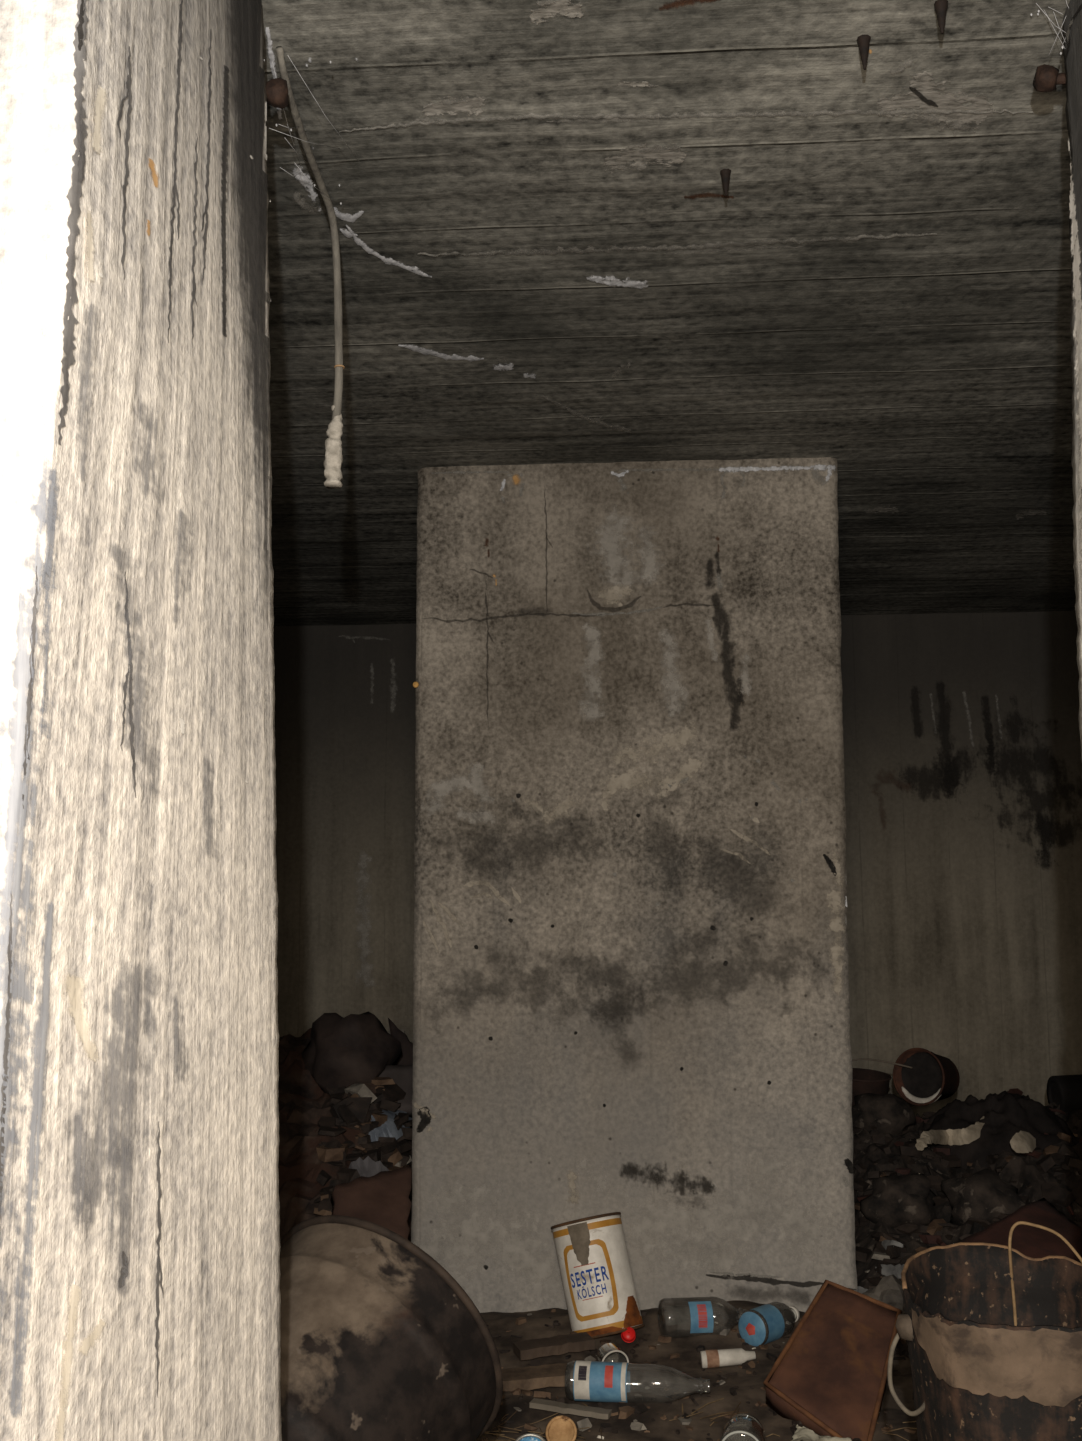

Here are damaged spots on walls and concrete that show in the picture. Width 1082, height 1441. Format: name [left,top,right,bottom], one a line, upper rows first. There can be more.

corrosion [660,0,715,10]
leakage [706,553,749,729]
leakage [905,683,1003,799]
leakage [567,1159,831,1275]